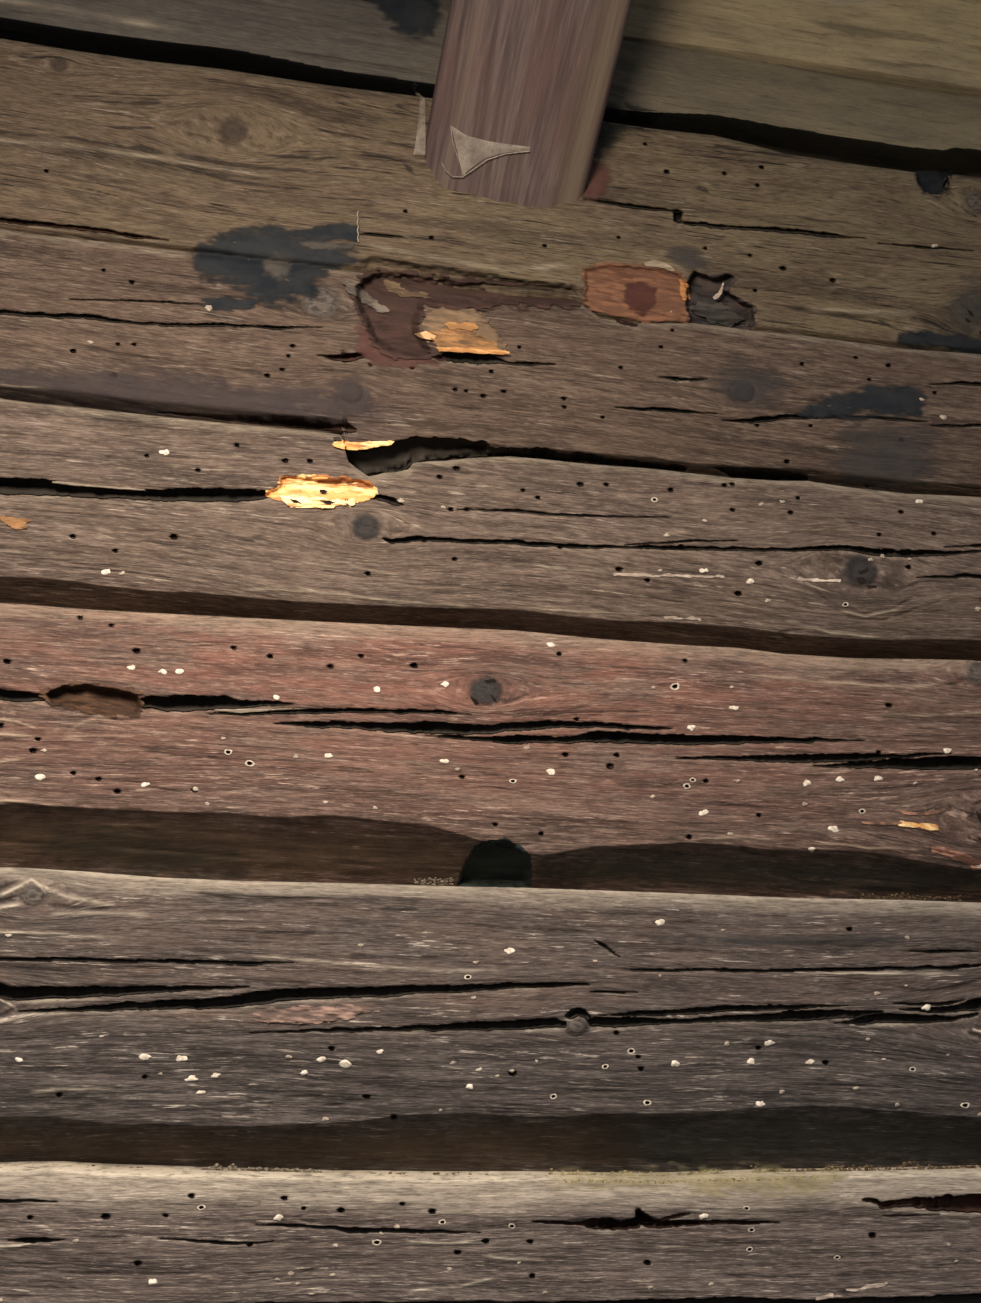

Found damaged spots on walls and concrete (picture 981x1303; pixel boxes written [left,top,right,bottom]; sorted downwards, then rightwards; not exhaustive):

water stain [192,223,360,311]
peeling [644,260,690,301]
peeling [415,322,510,355]
peeling [280,474,374,506]
crack [159,412,807,505]
water stain [799,386,926,484]
crack [383,509,981,578]
crack [0,690,46,701]
crack [140,695,981,769]
crack [0,941,981,1033]
crack [537,1209,779,1230]
crack [863,1194,981,1216]